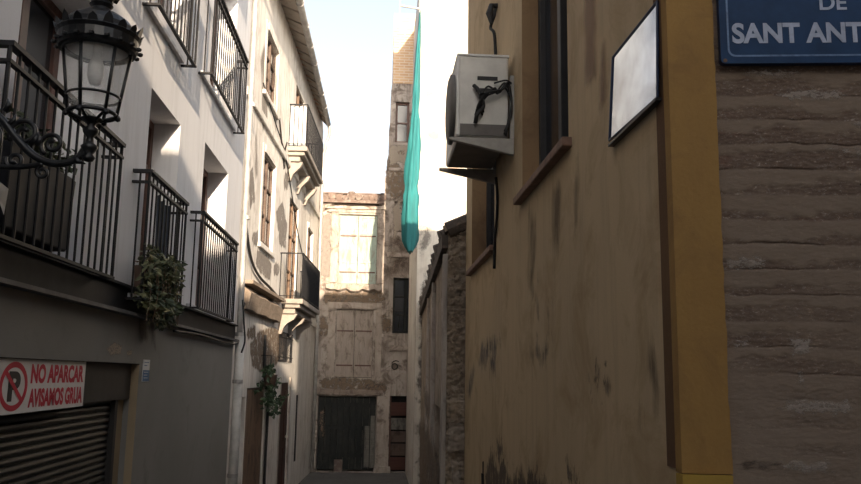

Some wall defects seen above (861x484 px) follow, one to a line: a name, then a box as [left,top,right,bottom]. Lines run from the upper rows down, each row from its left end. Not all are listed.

spalling [384,150,405,239]
peeling [321,213,385,304]
peeling [247,327,284,374]
peeling [319,377,387,392]
peeling [416,360,438,484]
peeling [485,443,545,484]